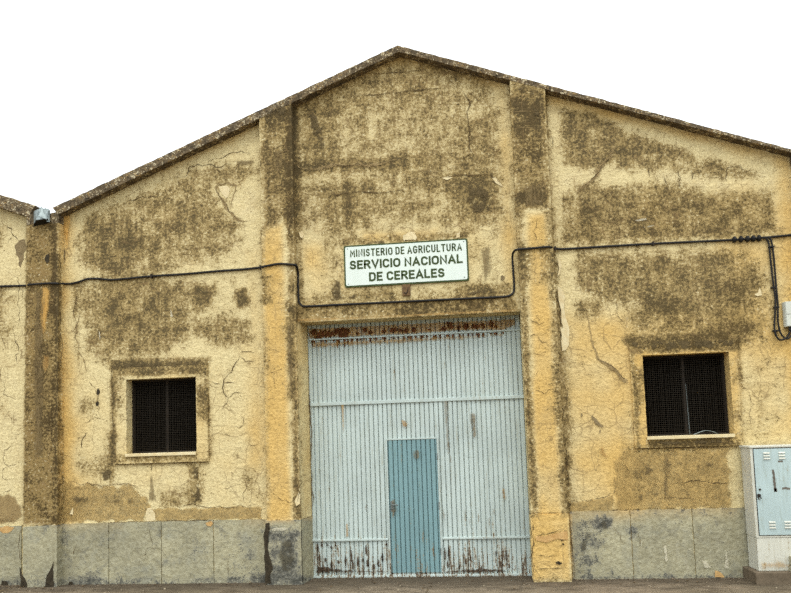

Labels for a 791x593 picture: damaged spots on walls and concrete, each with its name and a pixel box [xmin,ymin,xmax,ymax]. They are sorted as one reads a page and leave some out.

leakage [309,114,327,154]
crack [296,90,503,201]
crack [177,151,249,222]
leakage [467,186,489,212]
corrosion [298,310,515,348]
crack [214,351,253,409]
crack [531,259,649,492]
peeling [146,508,155,521]